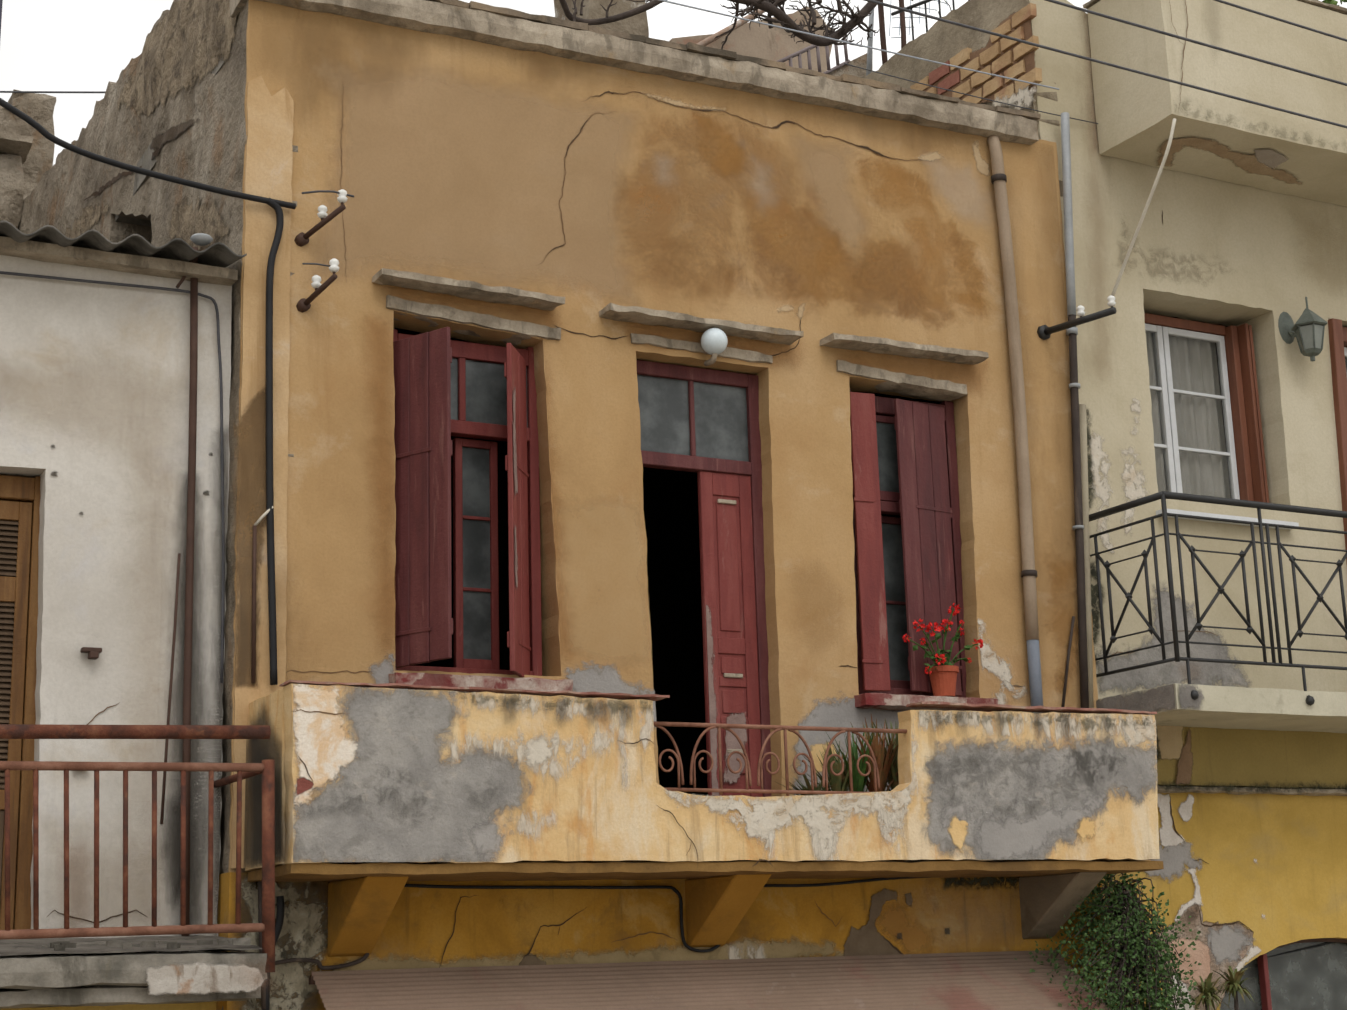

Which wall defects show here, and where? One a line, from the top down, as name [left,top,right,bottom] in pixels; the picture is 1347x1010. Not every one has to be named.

crack [536,91,944,266]
peeling [1157,137,1302,184]
peeling [1089,399,1147,553]
peeling [451,692,653,784]
peeling [470,811,556,861]
peeling [666,605,1261,1010]
crack [439,895,476,968]
crack [520,907,587,963]
peeling [333,889,950,971]